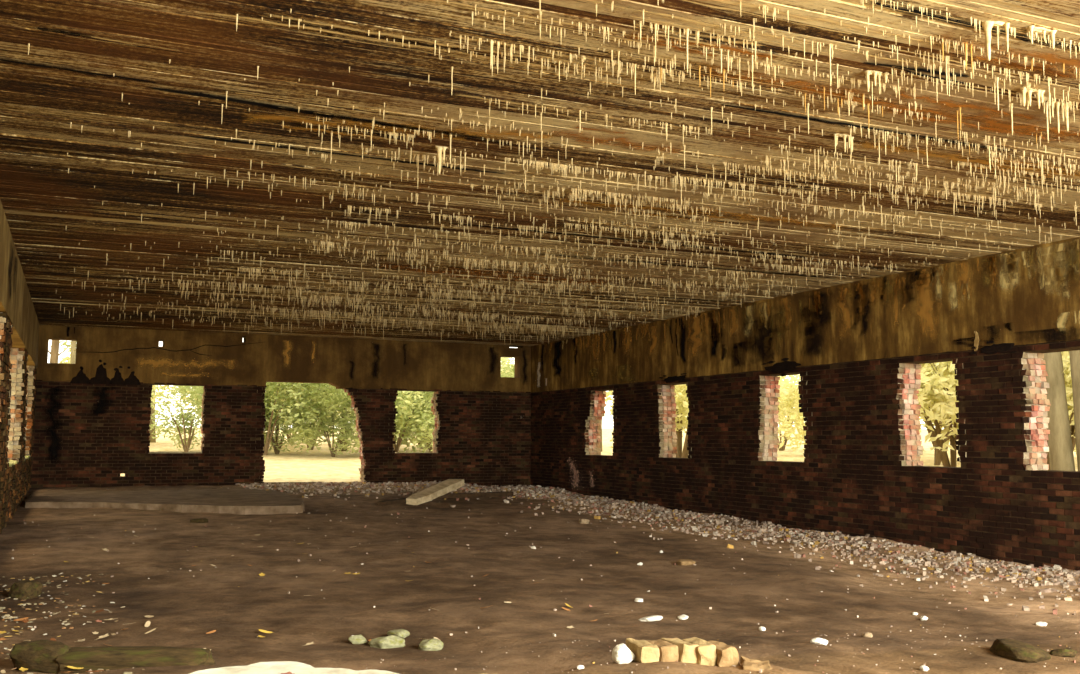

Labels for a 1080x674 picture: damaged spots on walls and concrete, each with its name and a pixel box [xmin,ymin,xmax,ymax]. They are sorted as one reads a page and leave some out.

damp [56,0,1080,386]
rust [630,34,1080,141]